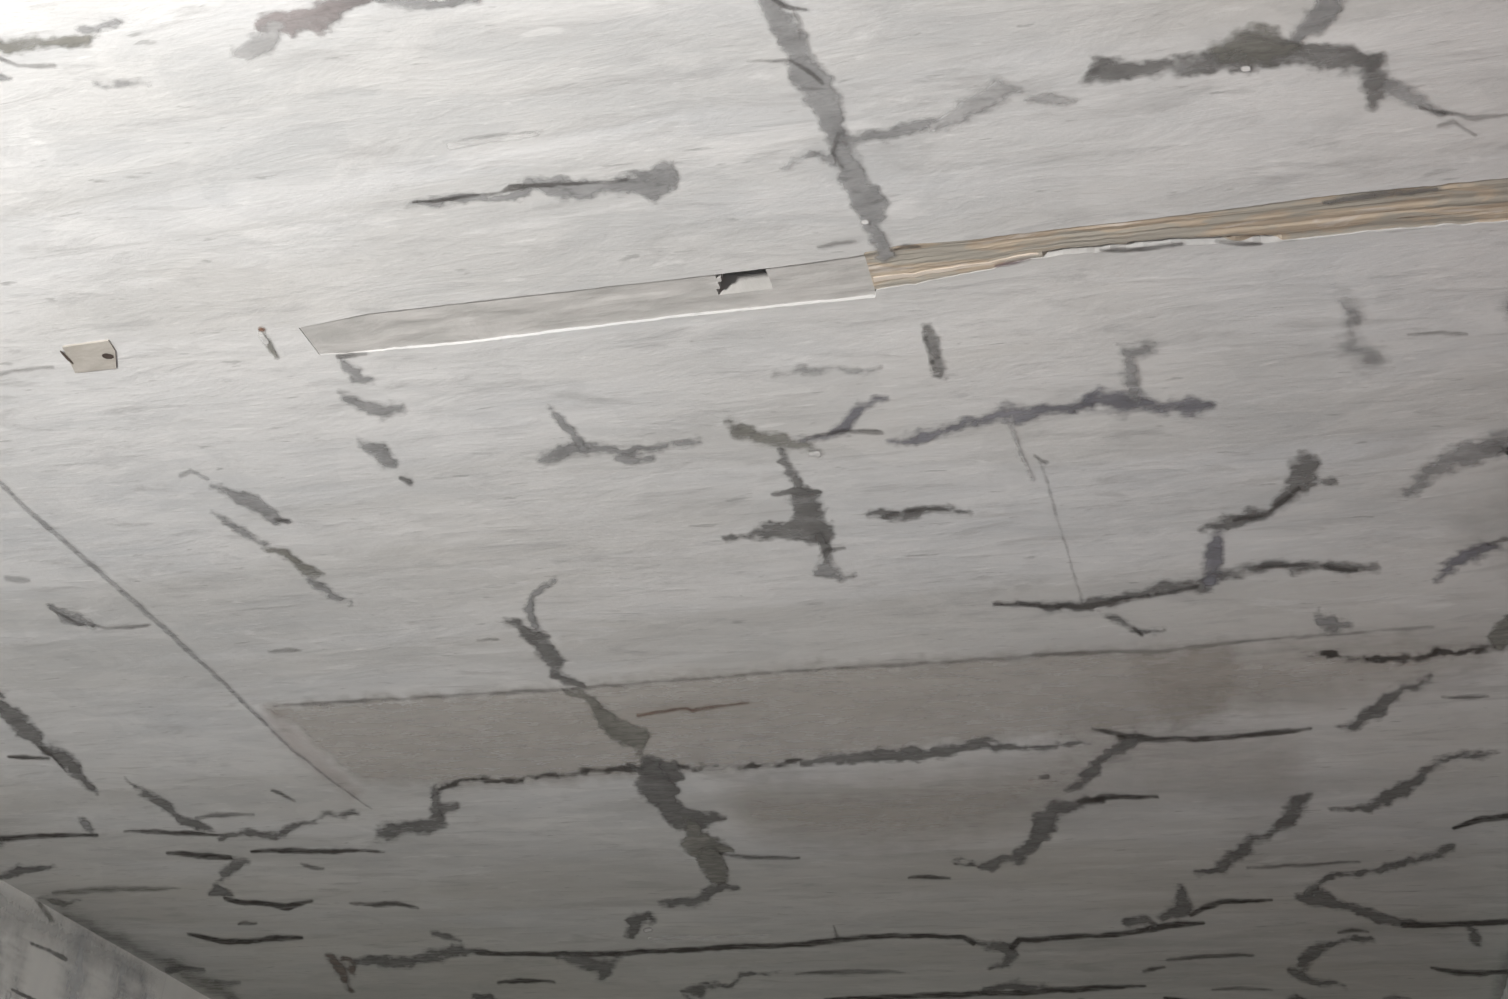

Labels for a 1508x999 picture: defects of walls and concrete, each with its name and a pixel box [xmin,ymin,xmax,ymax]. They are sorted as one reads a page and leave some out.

crack [413,164,678,207]
crack [759,0,1445,261]
crack [539,397,886,464]
crack [890,345,1214,459]
crack [1405,434,1508,495]
crack [218,488,343,600]
crack [1001,455,1374,635]
crack [1435,543,1498,580]
crack [0,579,1233,999]
crack [745,615,1508,879]
crack [1288,814,1508,999]